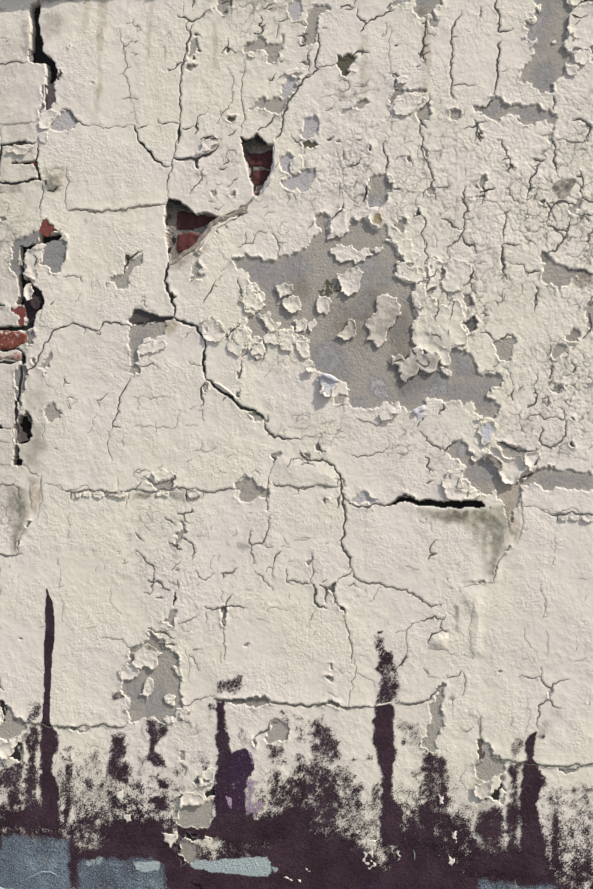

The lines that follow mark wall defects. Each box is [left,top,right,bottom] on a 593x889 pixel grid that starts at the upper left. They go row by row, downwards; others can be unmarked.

peeling [518,0,593,93]
peeling [248,116,319,196]
peeling [473,96,557,142]
spalling [10,231,67,281]
flaking render [176,211,216,280]
crack [0,0,482,745]
peeling [199,174,593,522]
crack [465,296,593,587]
peeling [118,631,183,724]
crack [512,587,588,733]
crack [12,717,146,784]
crack [460,755,593,810]